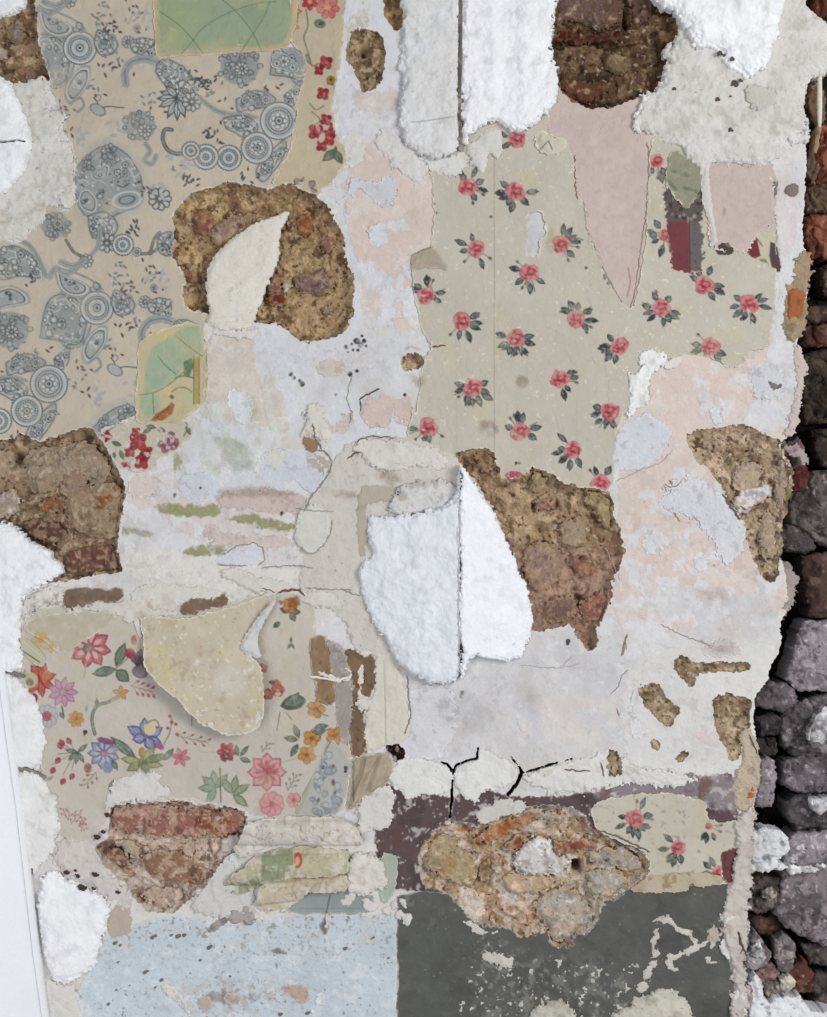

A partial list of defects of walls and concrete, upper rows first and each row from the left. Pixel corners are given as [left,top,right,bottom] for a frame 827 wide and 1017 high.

spalling [341,0,403,93]
peeling [547,0,678,308]
spalling [172,182,355,344]
spalling [0,427,126,584]
spalling [455,412,672,651]
spalling [657,250,815,620]
spalling [673,638,751,687]
spalling [63,800,248,913]
crack [415,747,479,850]
crack [506,758,604,796]
spalling [374,682,762,1017]